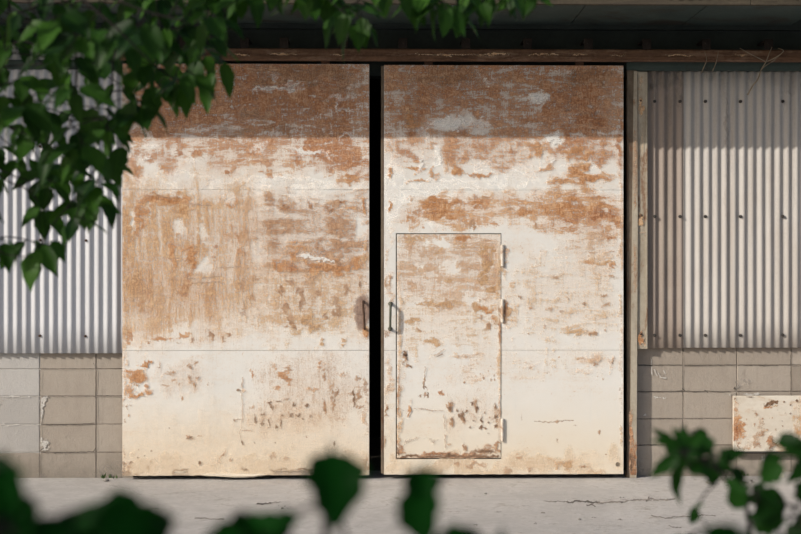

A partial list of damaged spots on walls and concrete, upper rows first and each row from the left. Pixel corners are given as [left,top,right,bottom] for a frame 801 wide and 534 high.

corrosion [122,64,369,446]
corrosion [384,65,623,474]
crack [233,377,251,445]
corrosion [620,410,637,475]
corrosion [733,399,801,450]
crack [546,498,714,528]